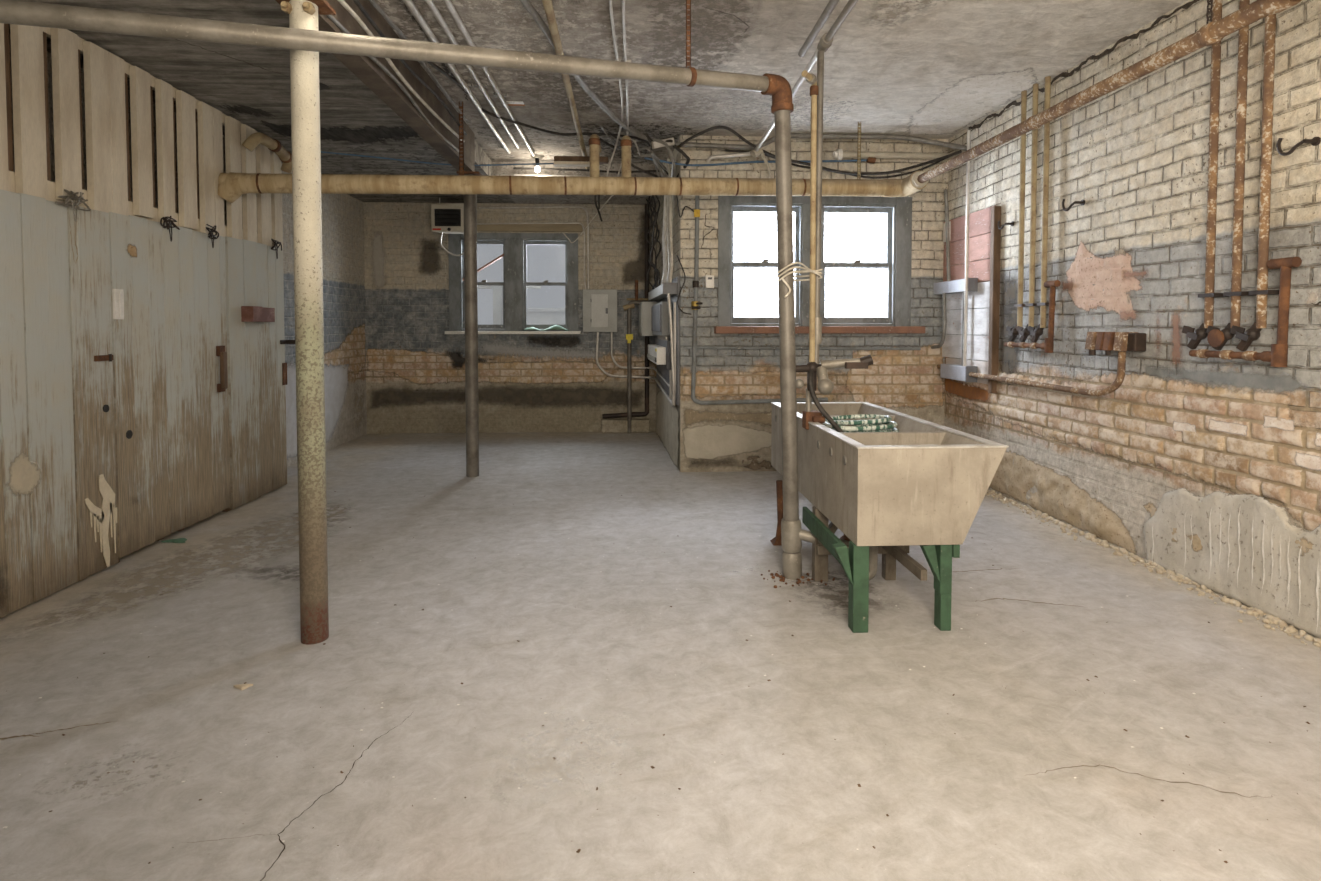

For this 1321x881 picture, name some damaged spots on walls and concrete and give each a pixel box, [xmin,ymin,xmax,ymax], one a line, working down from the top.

peeling [1063,241,1147,320]
peeling [846,343,1321,556]
spalling [986,450,1321,650]
crack [0,721,116,740]
crack [182,713,412,881]